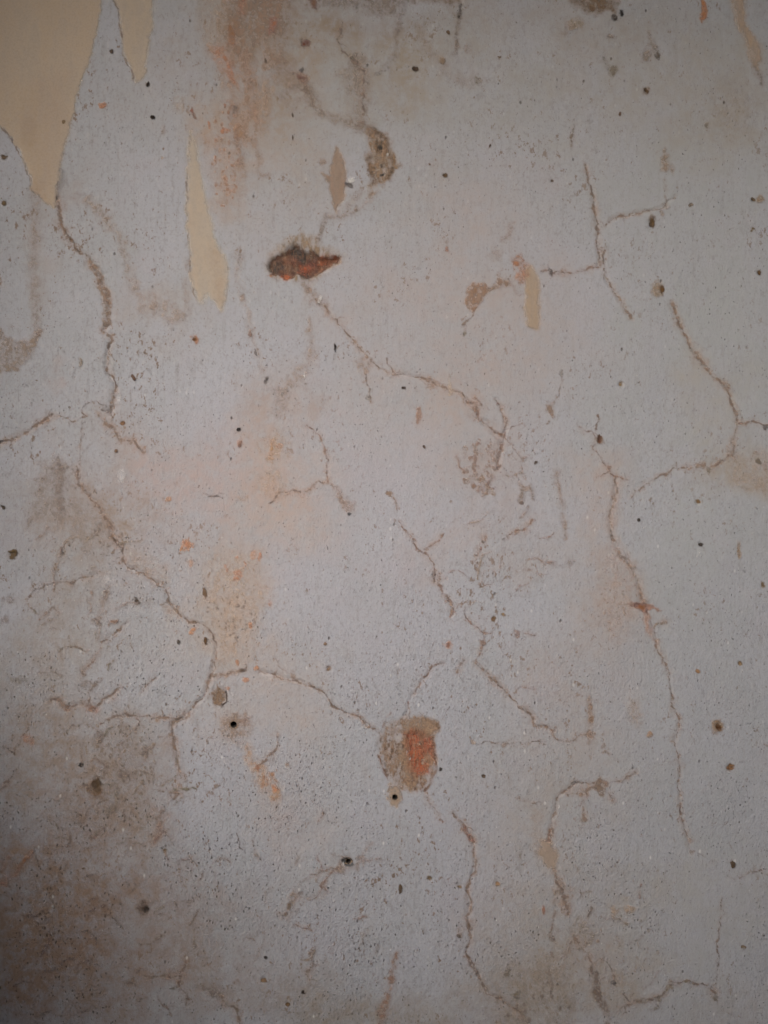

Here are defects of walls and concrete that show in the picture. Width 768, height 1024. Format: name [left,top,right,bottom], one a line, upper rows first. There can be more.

peeling [0,0,101,207]
crack [58,202,140,449]
peeling [110,0,152,86]
peeling [187,141,227,308]
peeling [323,148,354,209]
spalling [367,128,397,181]
peeling [523,267,539,328]
crack [672,303,768,429]
crack [51,471,247,799]
crack [402,527,558,742]
crack [442,813,522,1016]
crack [551,875,716,1006]